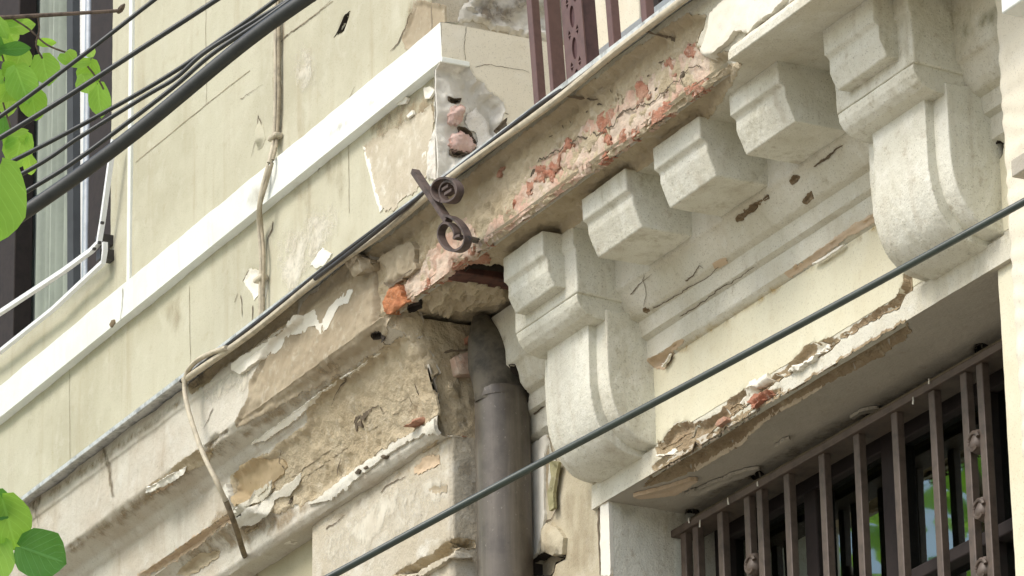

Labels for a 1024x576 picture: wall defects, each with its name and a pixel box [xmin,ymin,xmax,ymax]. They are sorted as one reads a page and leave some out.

crack [567,94,598,102]
crack [814,145,843,167]
flaking render [188,0,795,534]
crack [630,260,754,316]
flaking render [633,319,912,499]
flaking render [145,447,213,497]